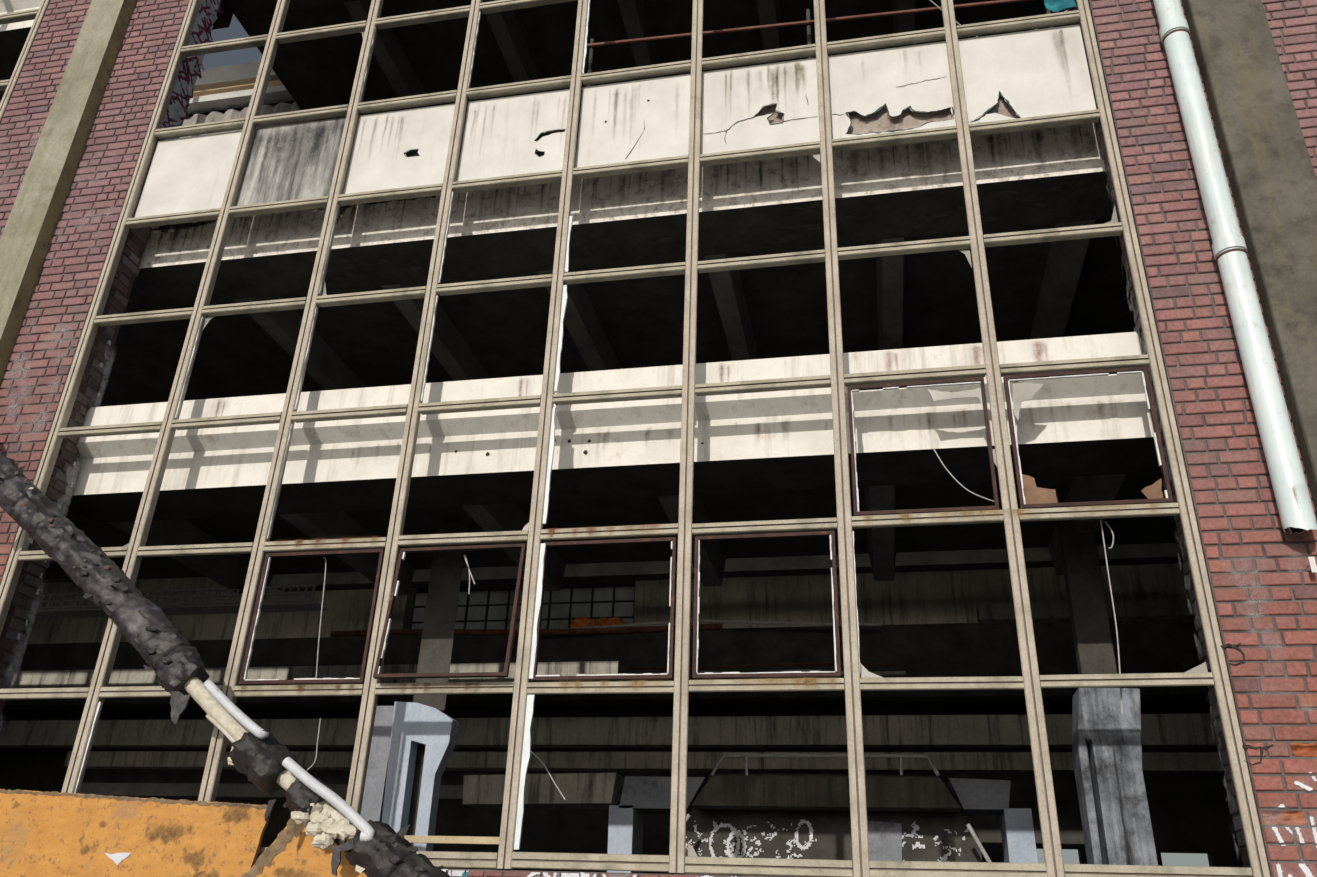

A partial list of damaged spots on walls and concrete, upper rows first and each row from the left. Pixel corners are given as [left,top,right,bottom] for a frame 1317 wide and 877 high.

crack [703,97,846,143]
spalling [846,91,1021,135]